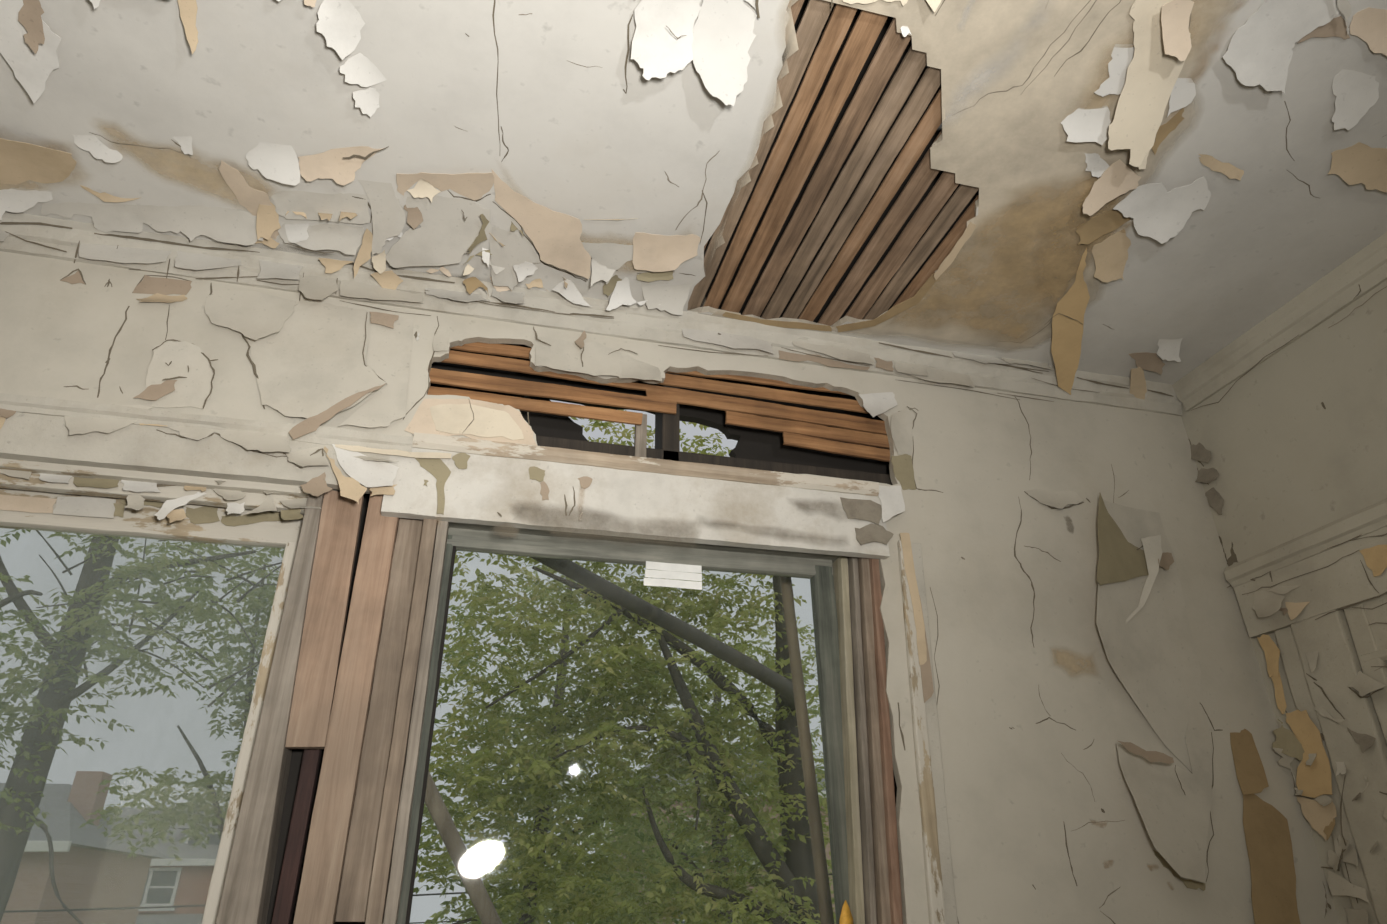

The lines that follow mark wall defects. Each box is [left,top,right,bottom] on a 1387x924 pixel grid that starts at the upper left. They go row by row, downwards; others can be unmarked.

crack [465,0,532,162]
crack [954,0,1121,115]
damp [1085,59,1112,109]
peeling [1223,0,1387,198]
crack [0,222,614,319]
flaking render [0,0,1244,526]
damp [902,176,1100,338]
crack [97,306,130,398]
peeling [840,392,943,703]
crack [658,320,1297,647]
spalling [1219,536,1238,566]
peeling [1360,545,1387,593]